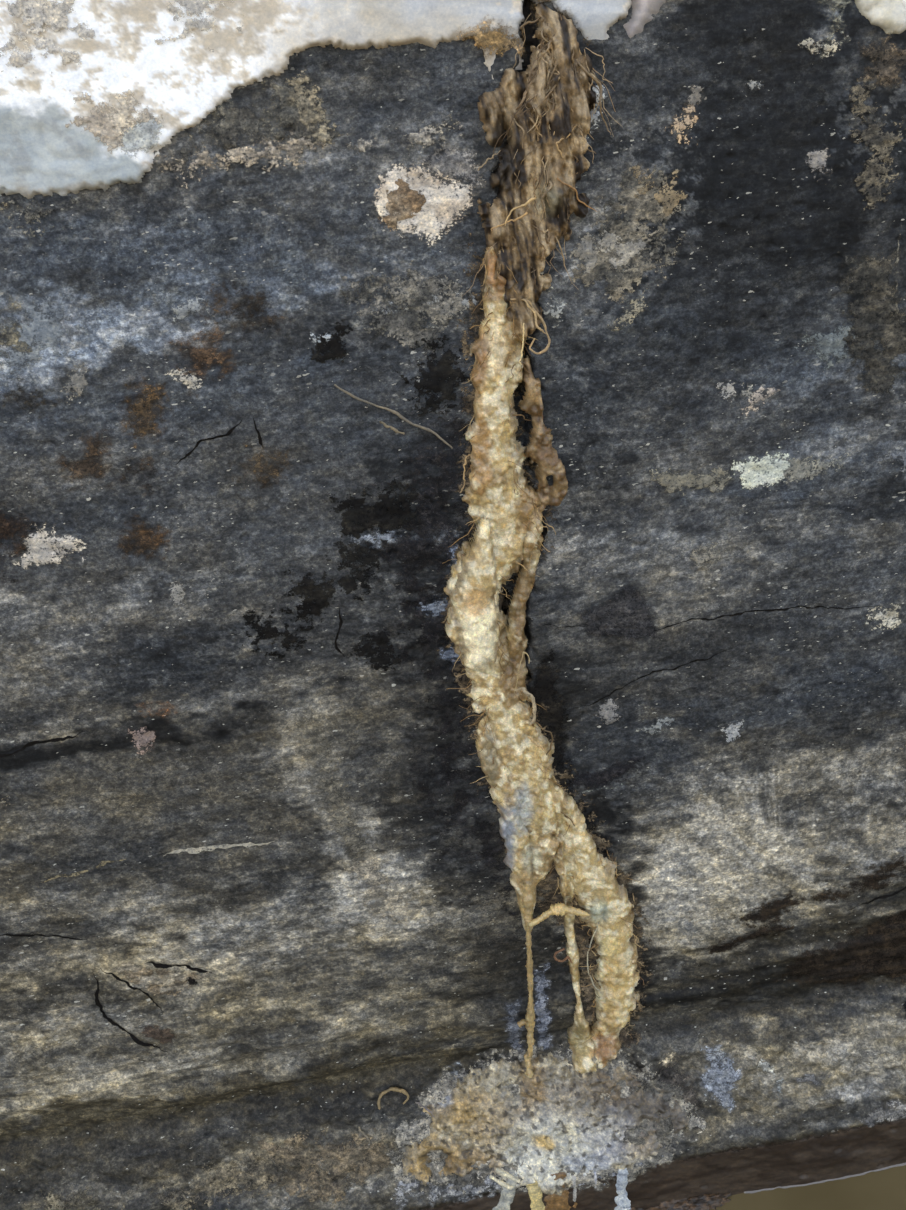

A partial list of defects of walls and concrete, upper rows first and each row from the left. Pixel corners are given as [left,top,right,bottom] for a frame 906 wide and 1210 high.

flaking render [0,0,666,199]
damp [421,139,486,196]
crack [654,606,889,631]
damp [239,233,906,1210]
crack [575,648,732,708]
crack [92,961,212,1052]